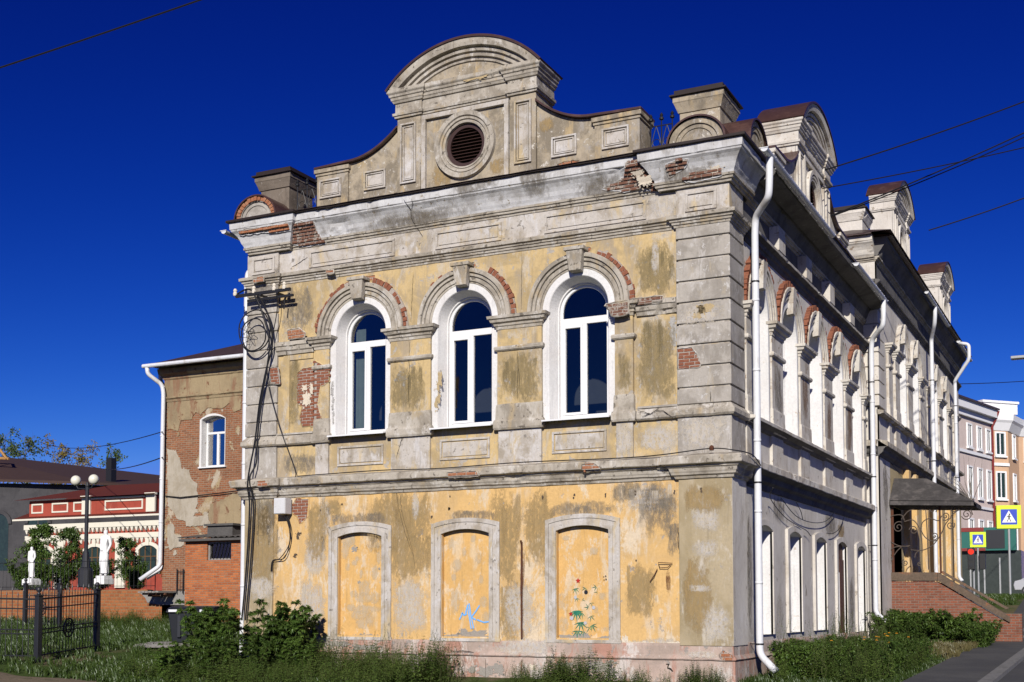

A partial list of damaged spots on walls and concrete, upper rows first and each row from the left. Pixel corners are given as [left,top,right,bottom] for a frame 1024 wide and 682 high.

flaking render [602,159,659,193]
flaking render [665,158,725,183]
flaking render [236,196,326,247]
damp [639,243,673,292]
flaking render [287,282,349,340]
damp [620,321,671,393]
flaking render [668,316,702,370]
flaking render [296,360,335,428]
flaking render [163,449,241,556]
damp [456,484,678,655]